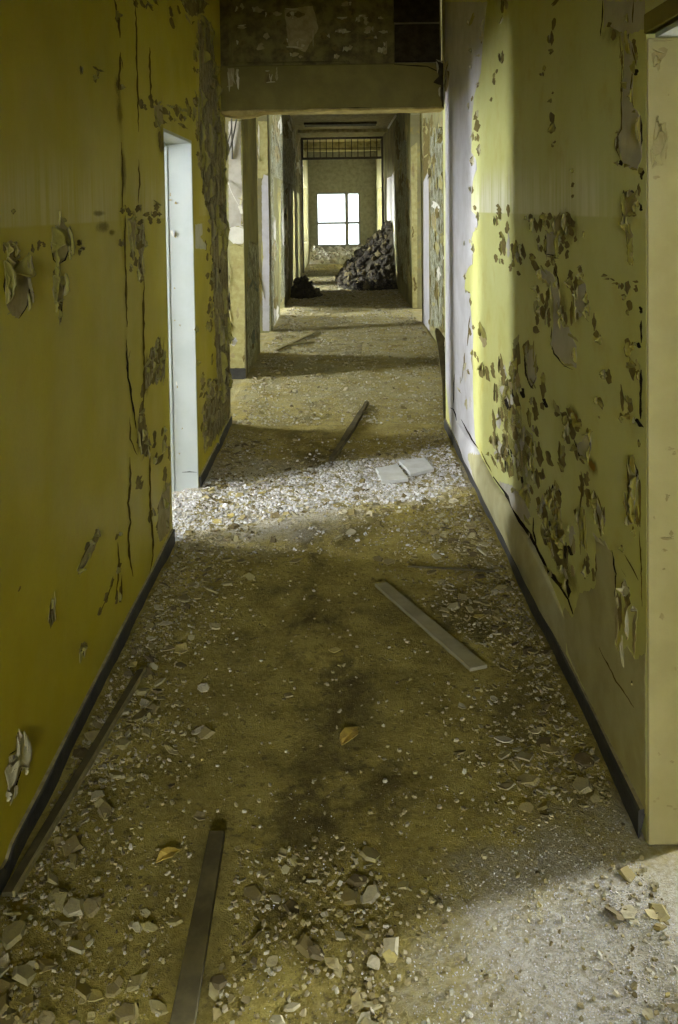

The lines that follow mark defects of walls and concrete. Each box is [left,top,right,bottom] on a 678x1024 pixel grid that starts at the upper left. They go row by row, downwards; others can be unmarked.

flaking render [235,0,656,815]